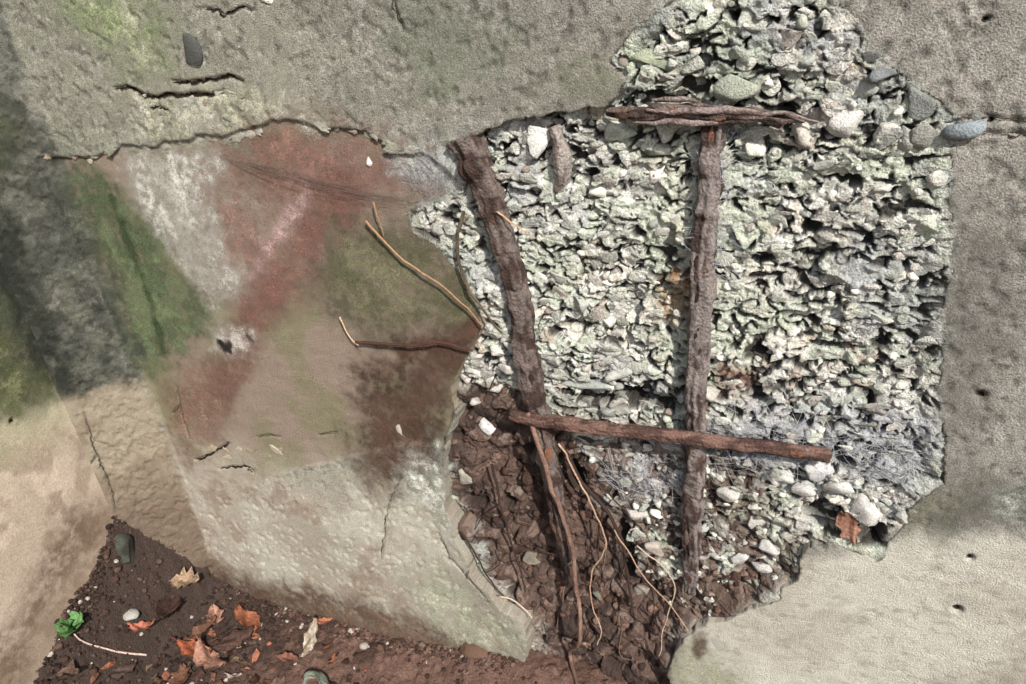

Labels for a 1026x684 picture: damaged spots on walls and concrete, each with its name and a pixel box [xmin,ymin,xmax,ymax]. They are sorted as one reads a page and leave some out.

crack [116,73,243,111]
crack [957,116,1026,138]
damp [127,75,464,455]
rust [661,269,691,321]
spalling [313,0,964,684]
rust [717,364,747,390]
damp [406,460,451,529]
rust [702,465,762,550]